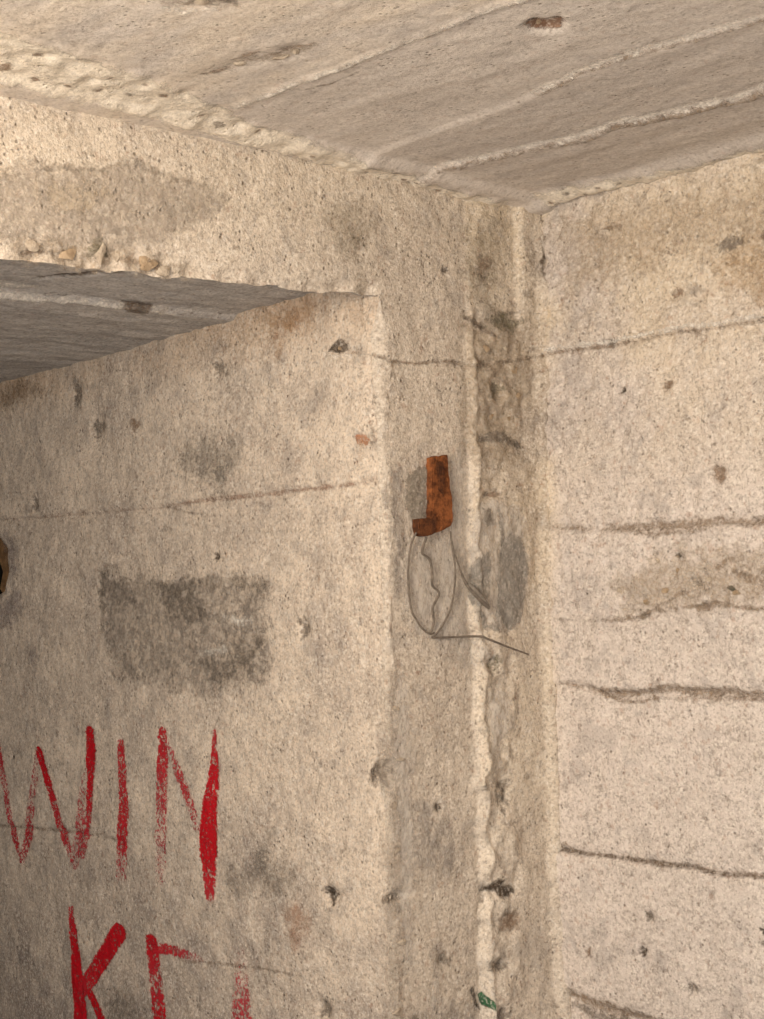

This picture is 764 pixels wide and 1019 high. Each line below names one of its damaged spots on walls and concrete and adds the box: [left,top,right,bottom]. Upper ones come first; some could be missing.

corrosion [436,461,445,495]
crack [557,516,764,536]
damp [405,448,528,664]
damp [101,566,272,693]
crack [567,682,764,703]
crack [560,842,764,879]
crack [571,990,651,1019]